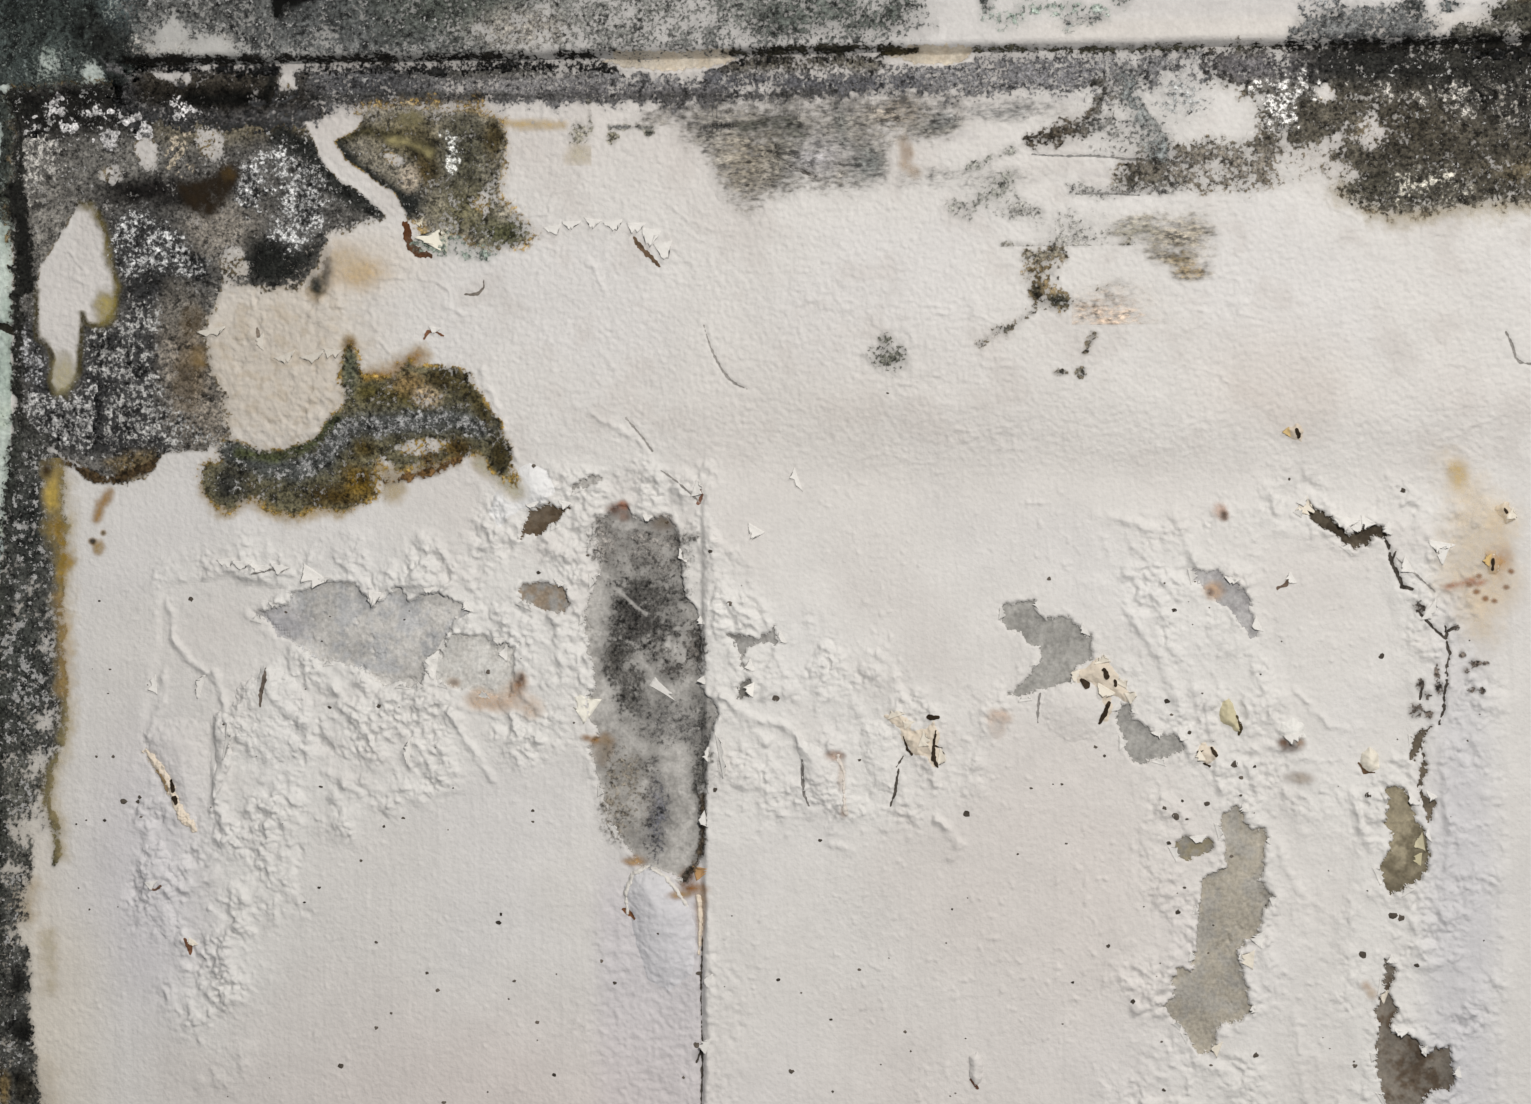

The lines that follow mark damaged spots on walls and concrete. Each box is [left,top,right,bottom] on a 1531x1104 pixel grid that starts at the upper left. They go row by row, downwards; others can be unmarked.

leakage [1284,0,1440,52]
leakage [1450,0,1531,48]
leakage [1107,33,1531,223]
crack [0,323,15,336]
peeling [217,558,515,699]
leakage [0,0,1130,1104]
peeling [516,506,719,885]
crack [1384,537,1456,725]
peeling [1372,726,1438,897]
crack [695,923,704,1104]
peeling [1163,802,1278,1058]
peeling [1370,954,1462,1104]